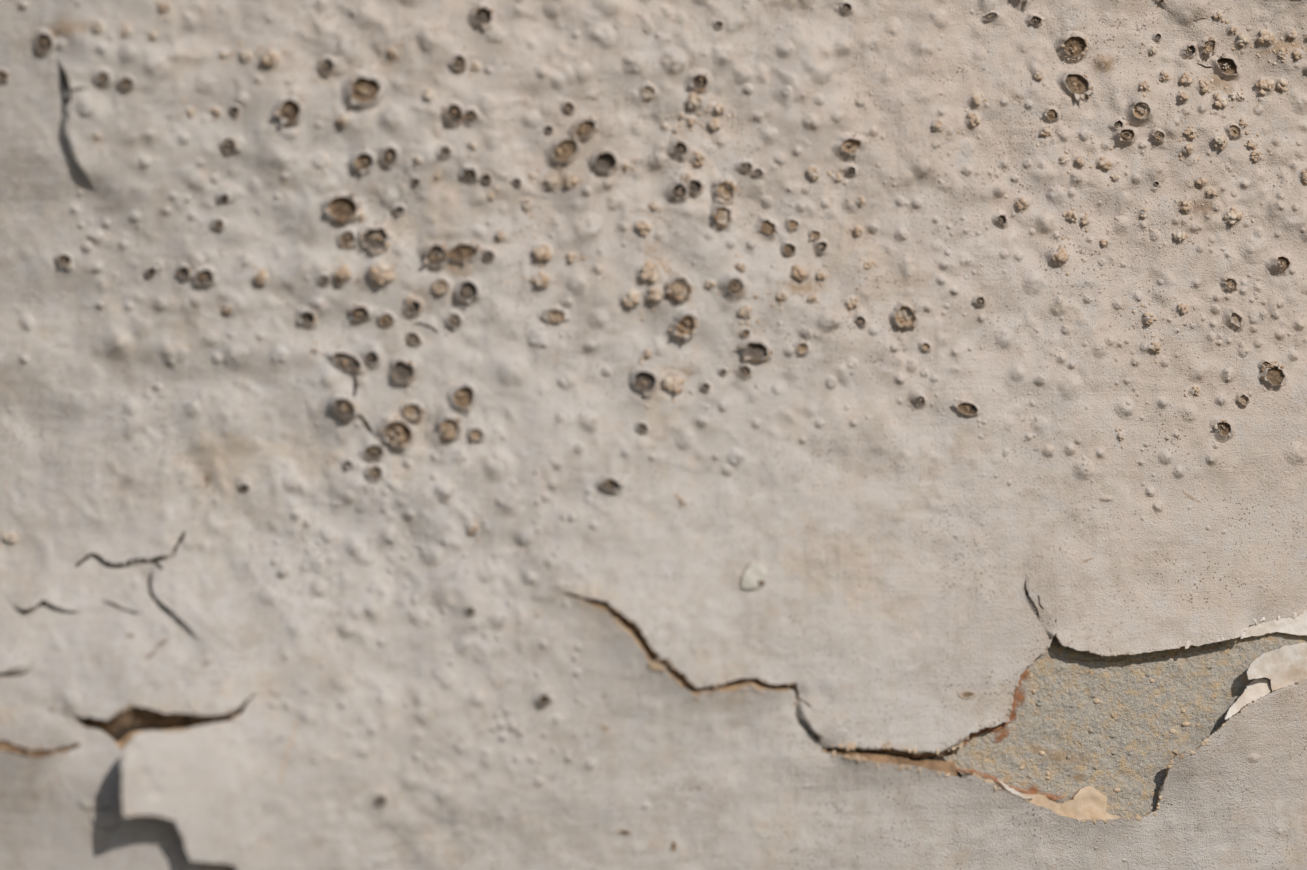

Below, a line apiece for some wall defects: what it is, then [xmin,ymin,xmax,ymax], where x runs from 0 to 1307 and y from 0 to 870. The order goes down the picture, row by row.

crack [1024,579,1044,618]
crack [0,666,31,676]
crack [0,694,259,761]
crack [561,590,964,777]
peeling [797,704,825,737]
peeling [943,610,1307,824]